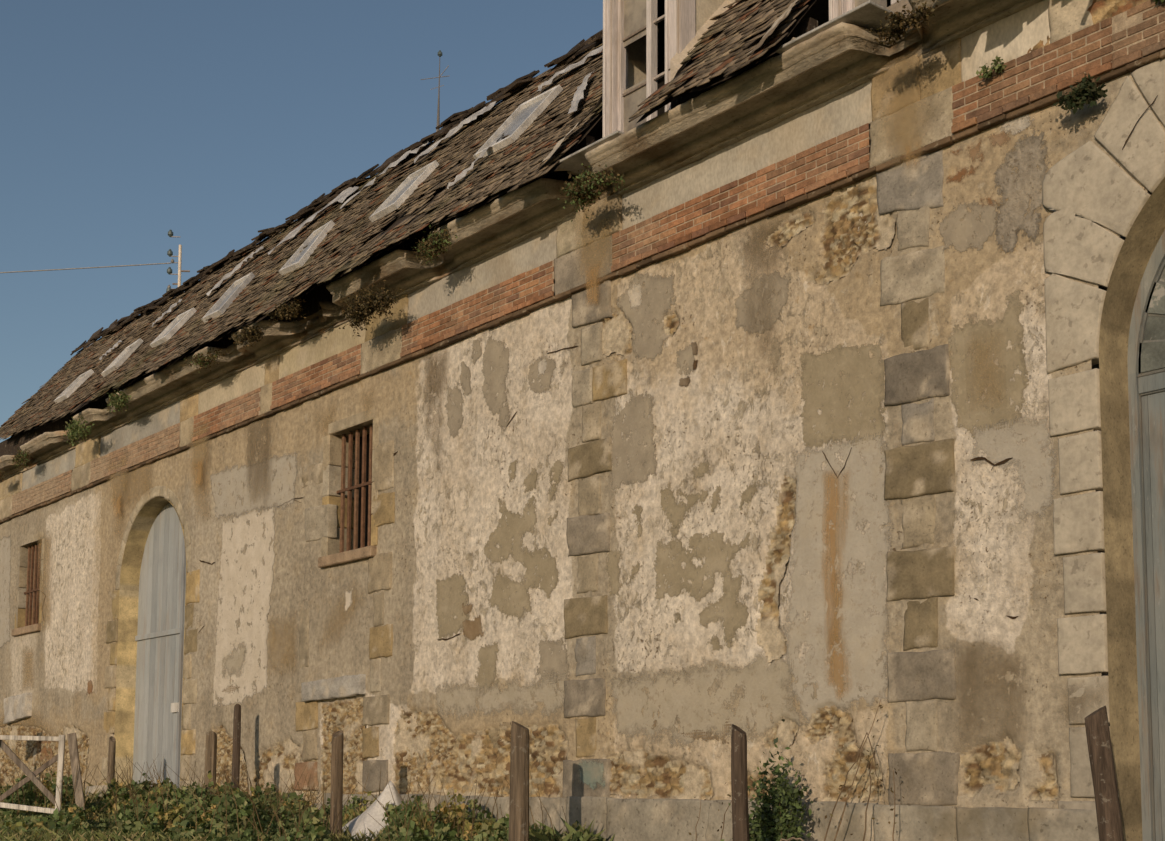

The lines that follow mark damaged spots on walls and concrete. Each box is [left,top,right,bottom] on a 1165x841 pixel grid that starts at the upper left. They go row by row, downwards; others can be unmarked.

flaking render [765,177,898,286]
peeling [735,271,789,337]
peeling [605,391,796,662]
peeling [436,459,564,693]
corrosion [826,475,844,694]
peeling [537,637,569,685]
flaking render [0,725,90,787]
flaking render [392,709,568,797]
flaking render [606,749,714,800]
flaking render [747,770,776,801]
flaking render [762,705,884,803]
flaking render [960,736,1059,801]